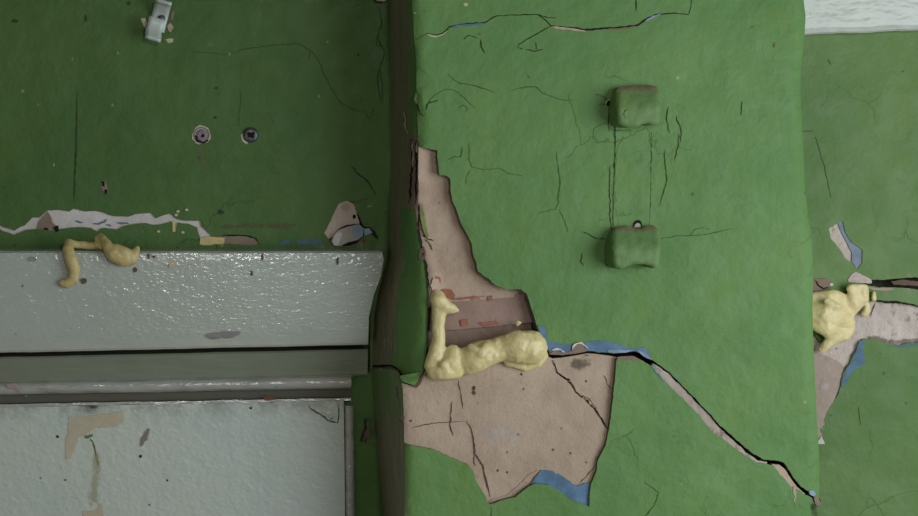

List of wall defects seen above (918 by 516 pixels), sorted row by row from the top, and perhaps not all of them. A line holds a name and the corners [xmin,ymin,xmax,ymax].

crack [418,0,692,53]
crack [421,74,567,114]
peeling [0,208,264,260]
spalling [324,198,378,246]
spalling [403,111,537,349]
spalling [829,221,872,284]
spalling [813,278,834,291]
crack [861,277,918,291]
spalling [813,300,918,444]
peeling [65,412,124,459]
spalling [400,353,617,506]
crack [538,325,821,516]